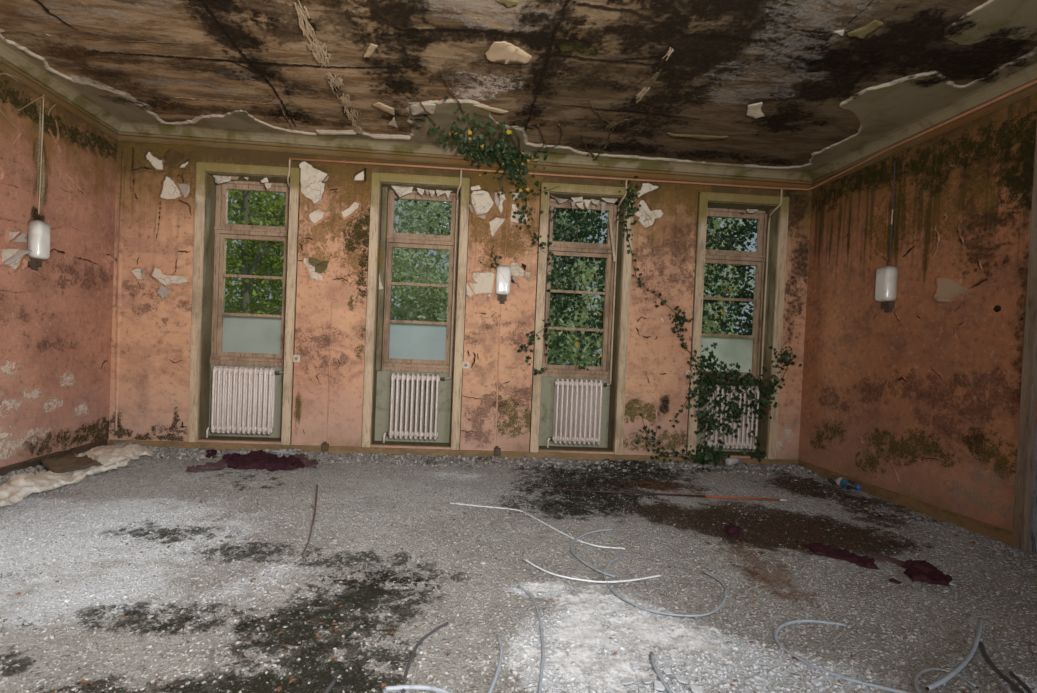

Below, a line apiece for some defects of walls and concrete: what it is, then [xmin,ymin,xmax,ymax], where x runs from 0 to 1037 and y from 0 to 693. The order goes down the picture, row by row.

crack [9,0,411,129]
water stain [26,0,1037,166]
water stain [0,78,212,208]
peeling [144,149,192,202]
peeling [296,161,362,226]
peeling [469,185,530,239]
peeling [633,181,665,230]
water stain [784,111,1037,341]
peeling [302,255,329,283]
peeling [466,269,496,297]
water stain [0,372,90,464]
water stain [660,395,670,414]